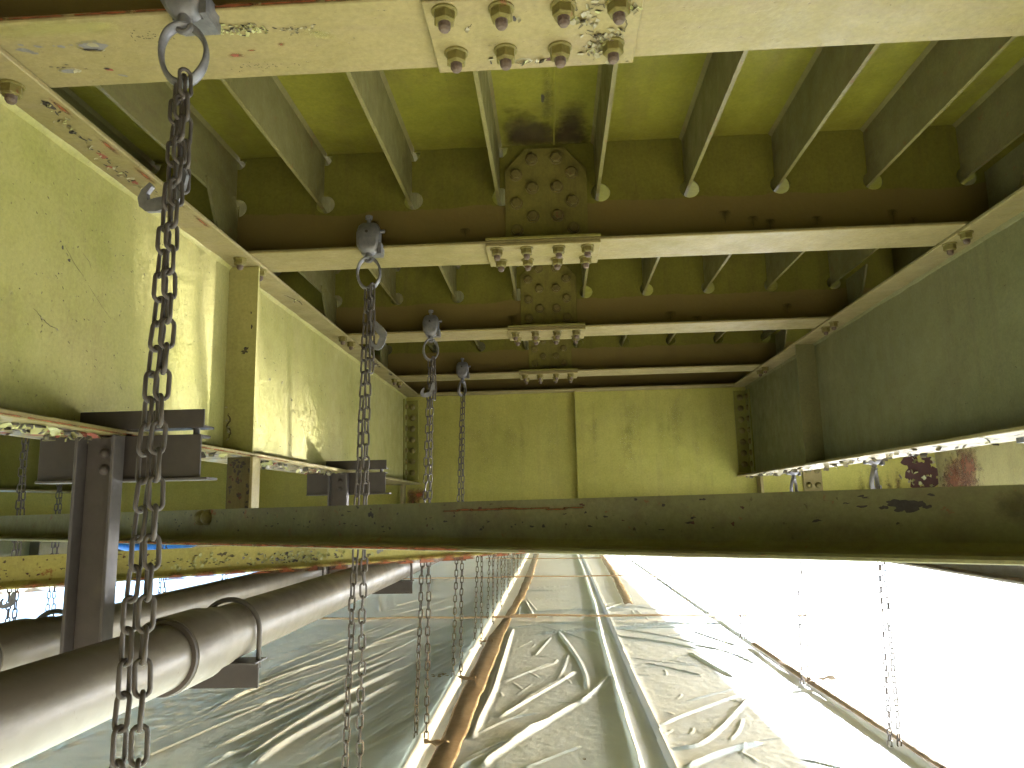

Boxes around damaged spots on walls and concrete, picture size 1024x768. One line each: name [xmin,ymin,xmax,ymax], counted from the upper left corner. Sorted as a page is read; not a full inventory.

peeling [221,23,318,37]
peeling [570,0,643,66]
water stain [509,108,584,143]
peeling [41,100,159,197]
peeling [0,422,111,443]
peeling [201,450,345,508]
peeling [746,434,1021,479]
rust [843,452,979,524]
peeling [154,548,352,572]